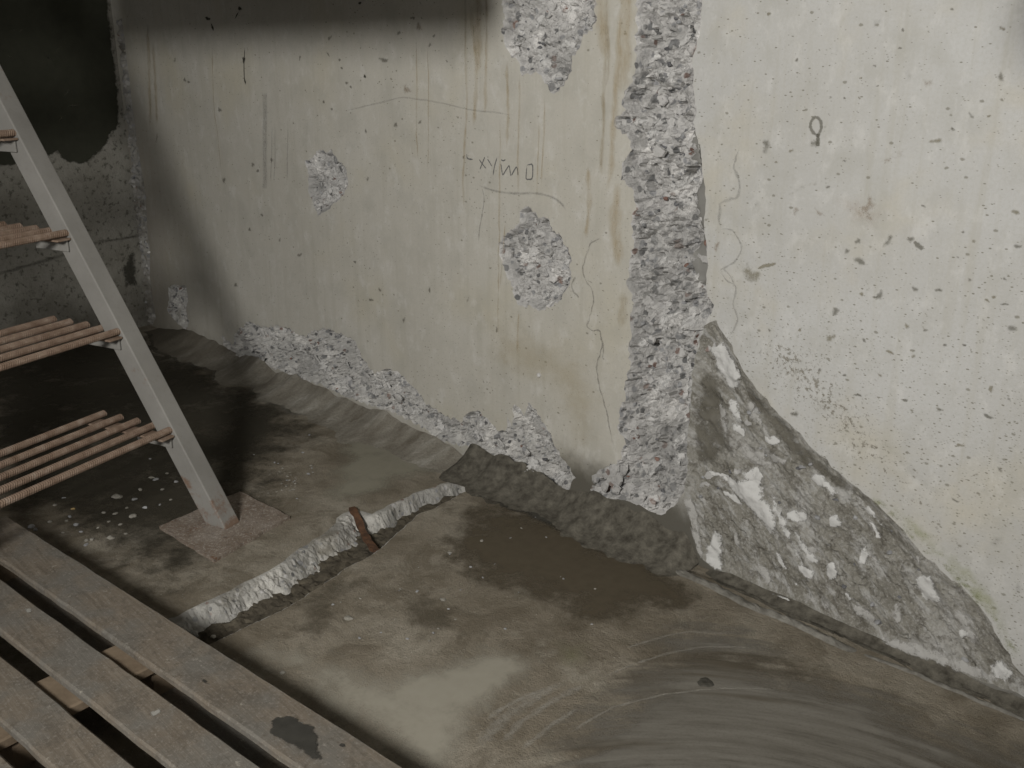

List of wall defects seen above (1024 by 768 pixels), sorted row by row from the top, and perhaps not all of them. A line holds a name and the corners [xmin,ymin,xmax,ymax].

spalling [501,0,597,94]
spalling [305,149,348,216]
spalling [498,206,572,311]
spalling [222,321,576,490]
corrosion [349,506,380,553]
water stain [445,502,692,620]
spalling [592,320,1024,697]